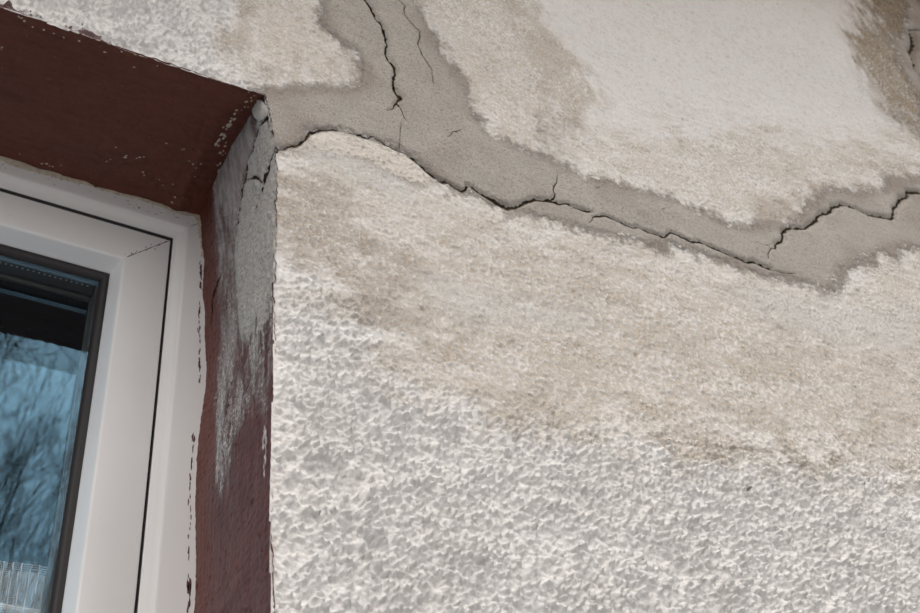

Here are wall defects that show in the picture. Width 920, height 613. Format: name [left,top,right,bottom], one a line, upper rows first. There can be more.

peeling [213,92,270,491]
crack [237,0,920,274]